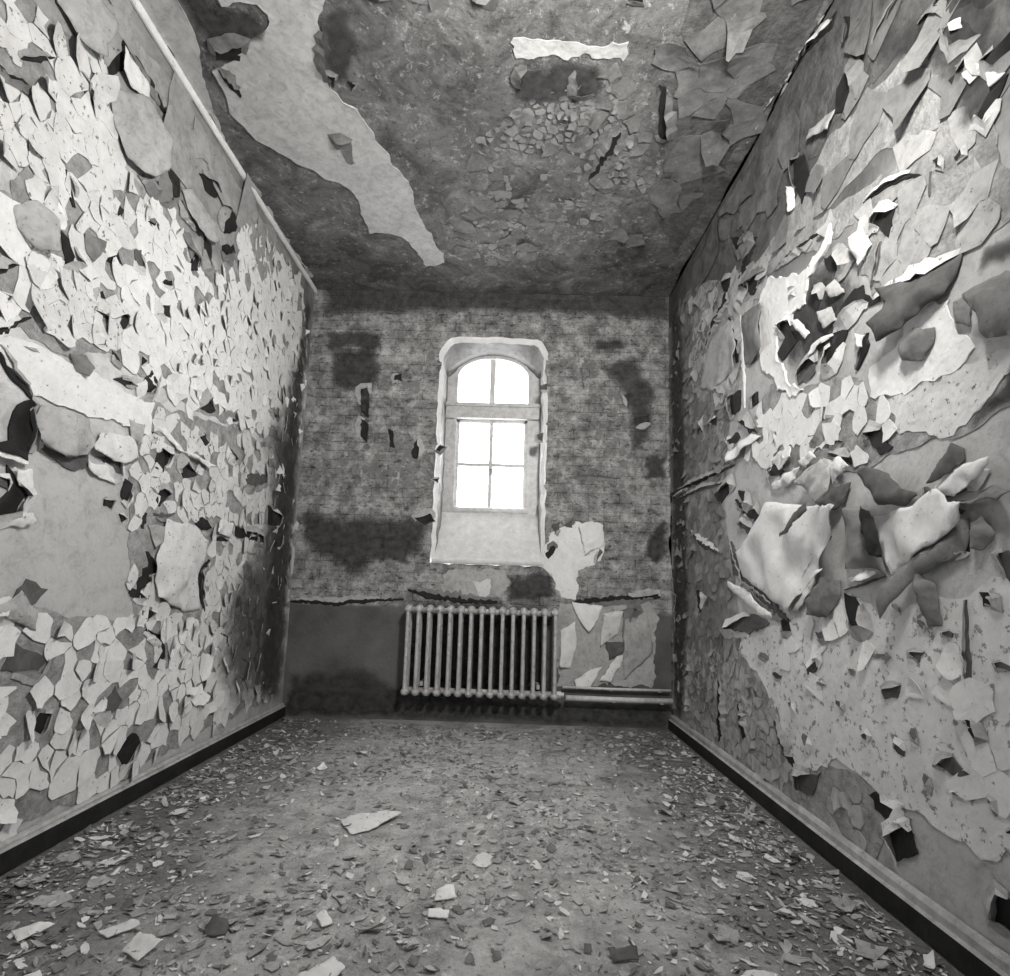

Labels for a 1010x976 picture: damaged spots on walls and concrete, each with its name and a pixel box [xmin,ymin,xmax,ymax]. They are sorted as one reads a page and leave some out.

peeling [0,0,447,842]
peeling [189,0,1010,867]
damp [645,456,665,478]
damp [225,306,423,698]
damp [647,521,665,562]
damp [509,574,555,600]
damp [286,606,667,727]
peeling [86,835,129,888]
peeling [428,908,449,919]
peeling [778,882,820,927]
peeling [982,879,1010,940]
peeling [923,950,935,970]